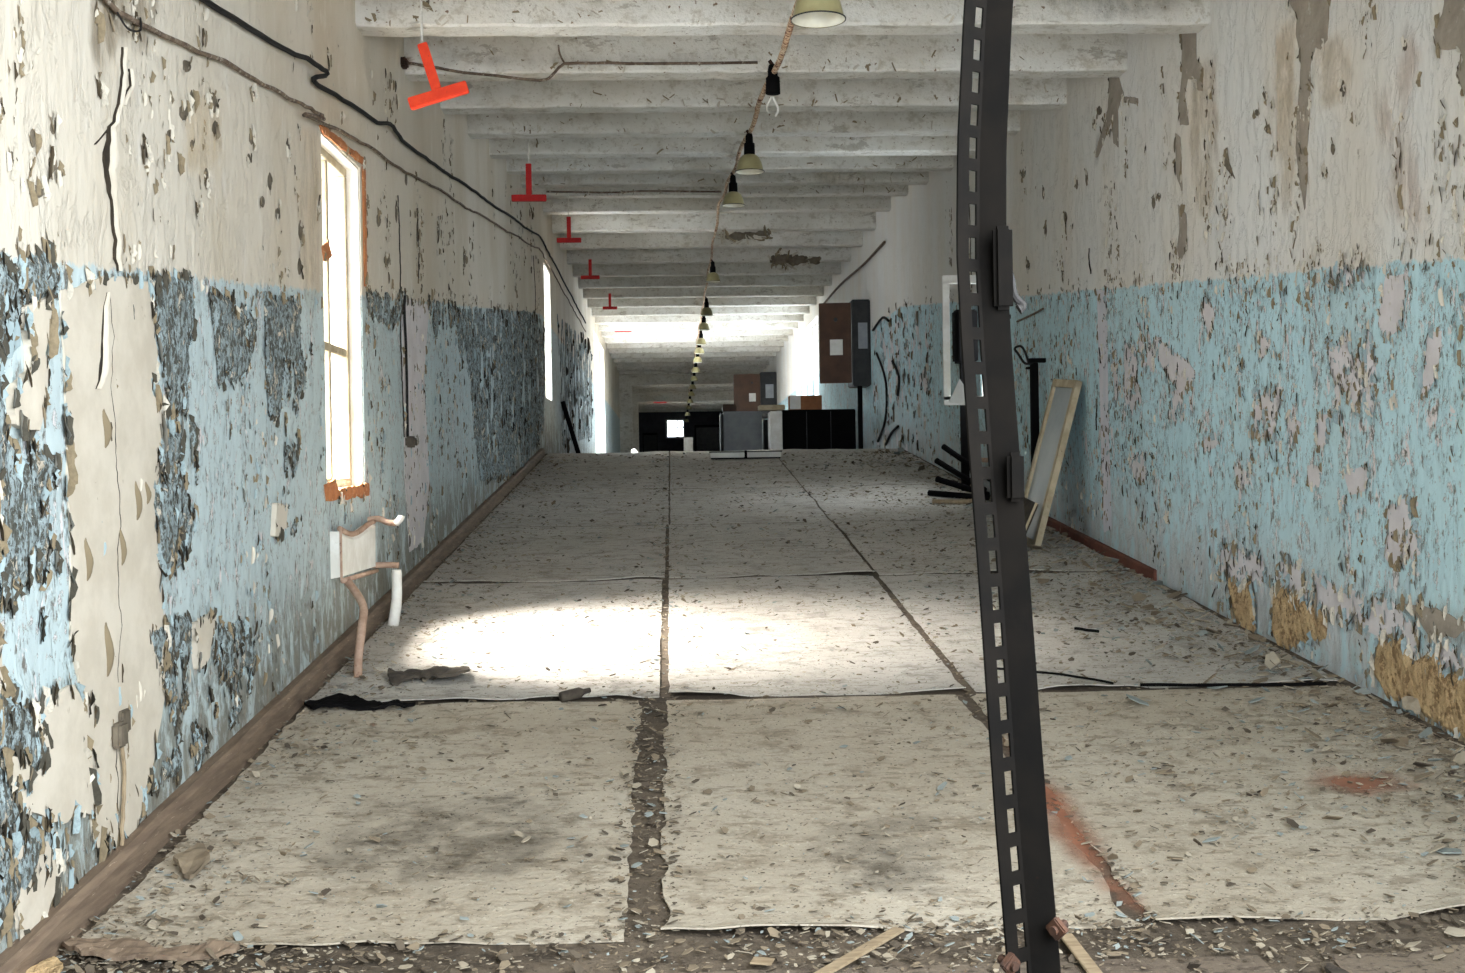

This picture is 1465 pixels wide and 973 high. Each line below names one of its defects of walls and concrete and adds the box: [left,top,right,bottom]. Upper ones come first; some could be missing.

spalling [0,0,66,207]
spalling [249,81,258,102]
peeling [370,59,398,140]
peeling [512,7,603,23]
spalling [200,123,332,318]
crack [94,47,136,683]
flaking render [0,226,175,948]
flaking render [188,607,217,682]
flaking render [223,352,305,697]
crack [113,749,121,833]